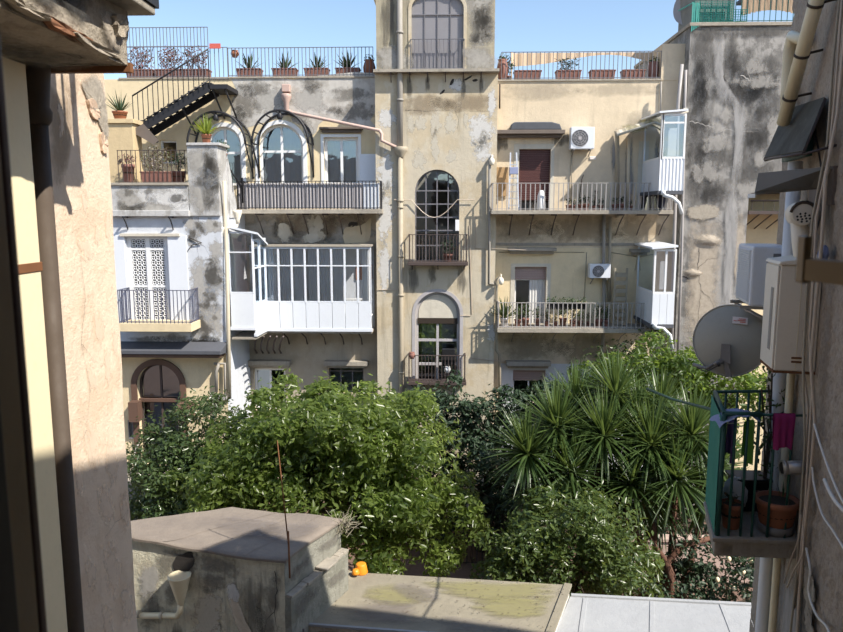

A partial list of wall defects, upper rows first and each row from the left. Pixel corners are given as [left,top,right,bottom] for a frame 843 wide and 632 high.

spalling [3,0,129,57]
water stain [463,0,496,68]
flaking render [82,74,109,154]
water stain [328,88,371,119]
peeling [468,89,496,162]
water stain [117,189,171,210]
water stain [186,149,222,214]
water stain [686,26,784,305]
water stain [145,592,160,621]